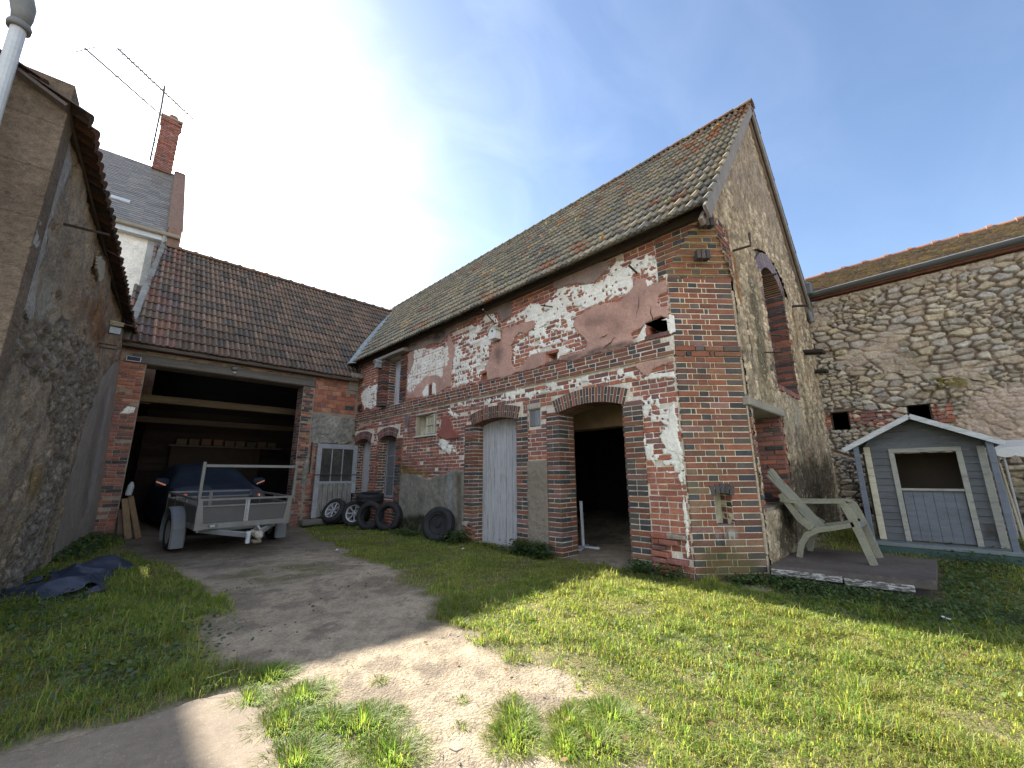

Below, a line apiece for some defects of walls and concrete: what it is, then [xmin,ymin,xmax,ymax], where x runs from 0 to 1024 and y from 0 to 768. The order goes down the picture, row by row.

flaking render [553,261,611,289]
flaking render [407,277,676,399]